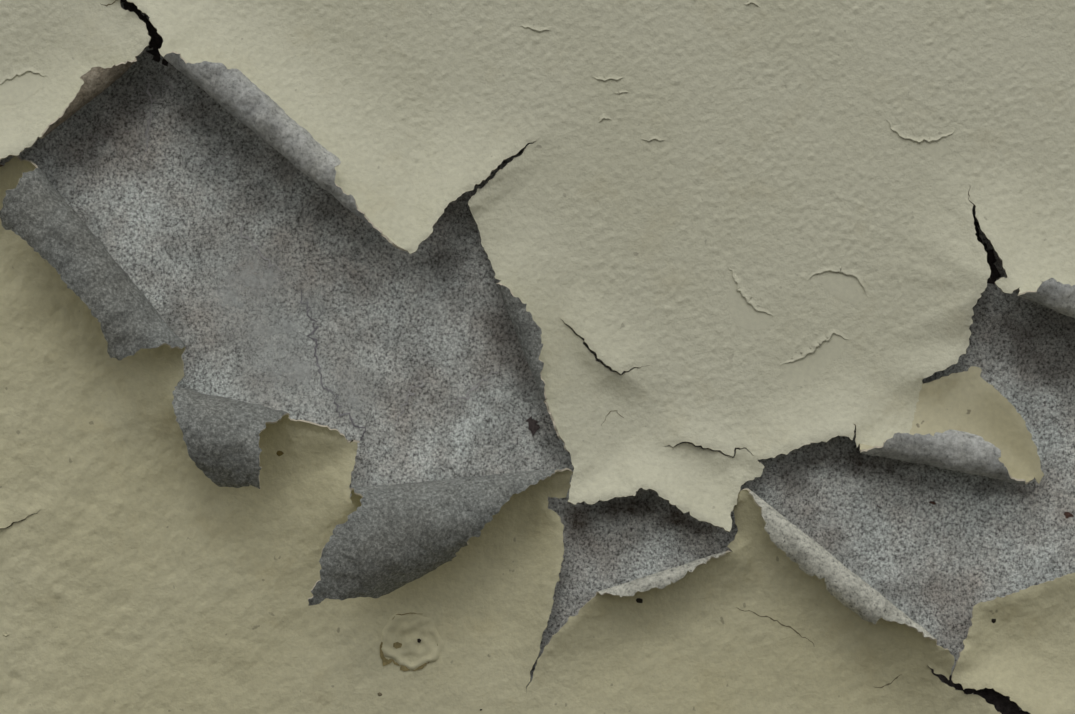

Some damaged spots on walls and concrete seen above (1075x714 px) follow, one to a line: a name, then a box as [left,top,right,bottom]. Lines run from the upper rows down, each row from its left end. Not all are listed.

crack [972,208,1001,284]
peeling [727,267,774,330]
peeling [0,47,738,681]
peeling [743,265,1075,675]
crack [928,666,1029,714]